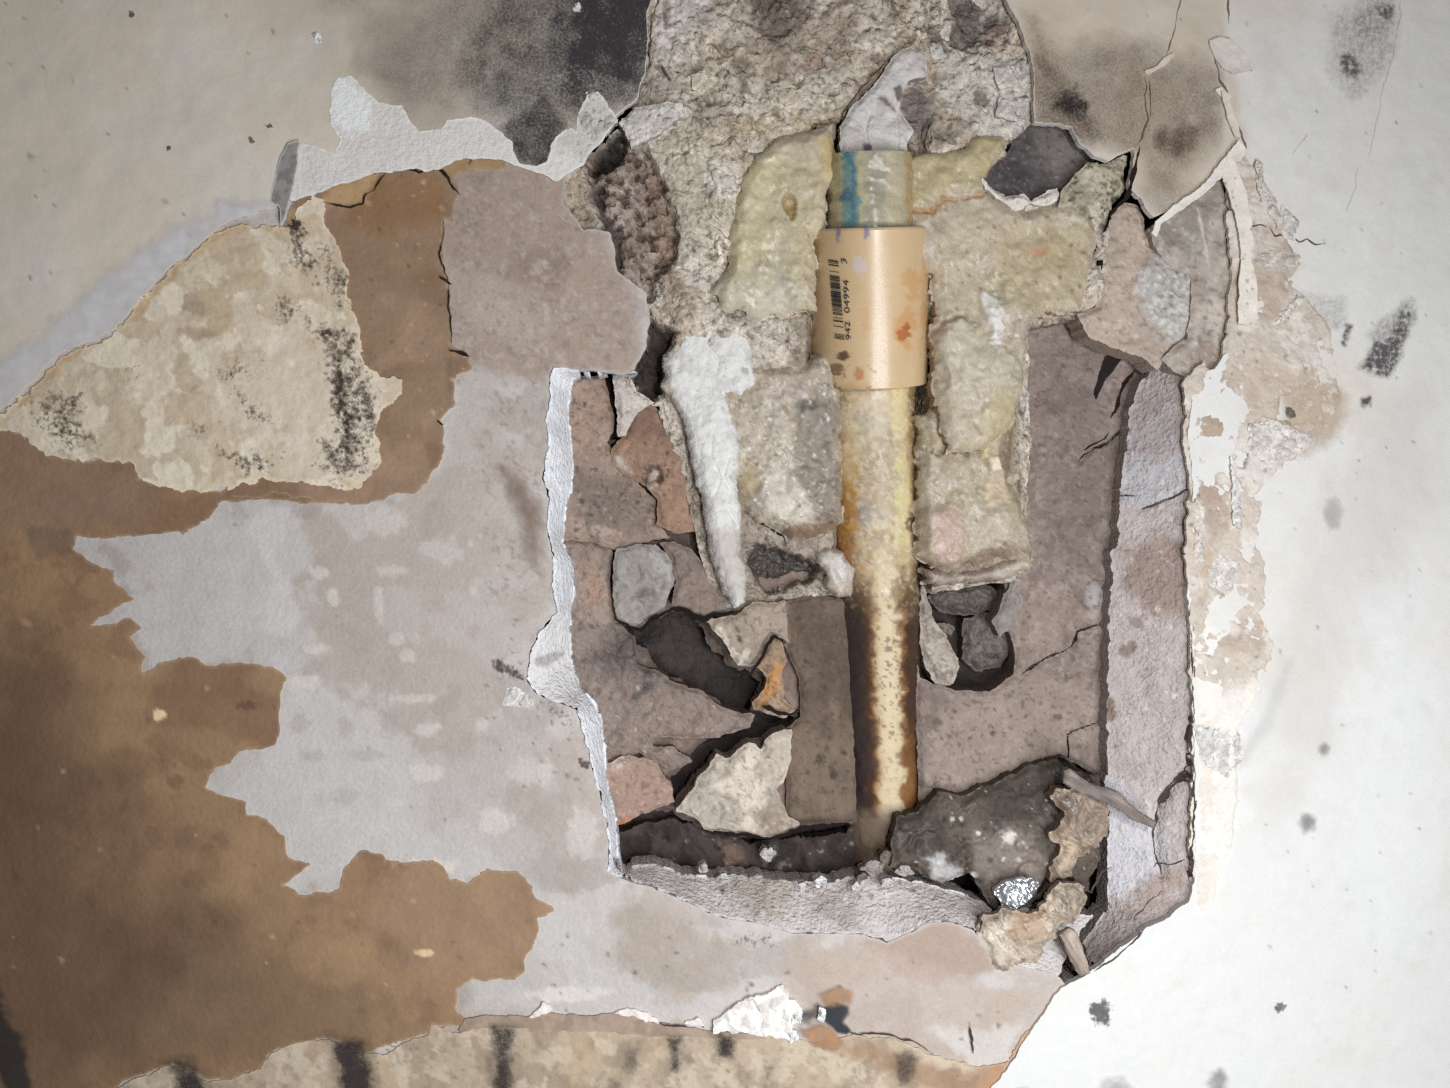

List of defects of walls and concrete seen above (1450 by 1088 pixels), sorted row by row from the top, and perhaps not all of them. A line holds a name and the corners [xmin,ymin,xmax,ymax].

mould [463,0,651,166]
mould [1037,57,1102,139]
mould [288,220,348,307]
mould [310,322,376,474]
spalling [1007,191,1112,520]
spalling [1144,37,1342,917]
peeling [0,0,1064,1088]
water stain [493,659,524,680]
water stain [0,1004,30,1088]
water stain [171,1062,204,1088]
water stain [334,1041,372,1088]
water stain [492,1026,514,1088]